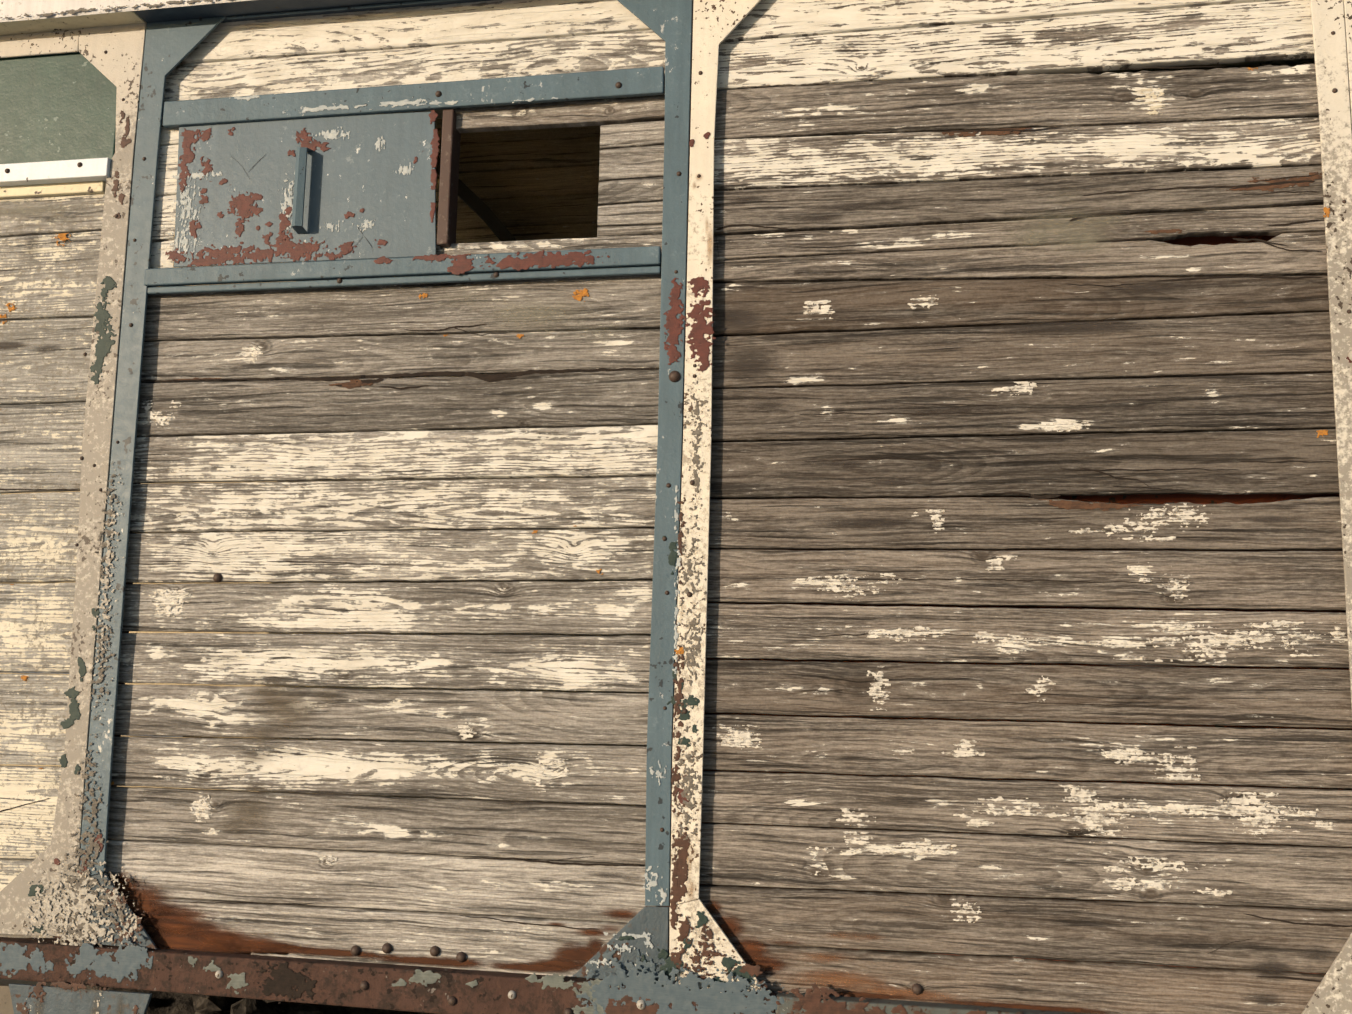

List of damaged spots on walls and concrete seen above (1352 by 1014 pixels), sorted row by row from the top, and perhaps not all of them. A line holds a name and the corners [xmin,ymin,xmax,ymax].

peeling [165,97,463,267]
crack [1069,172,1323,287]
peeling [89,276,117,385]
peeling [1071,503,1209,542]
crack [983,460,1332,511]
peeling [525,277,927,1014]
peeling [0,463,153,1014]
peeling [1101,746,1201,781]
peeling [953,785,1333,844]
rust [110,875,635,972]
rust [707,903,783,974]
rust [817,956,1104,1014]